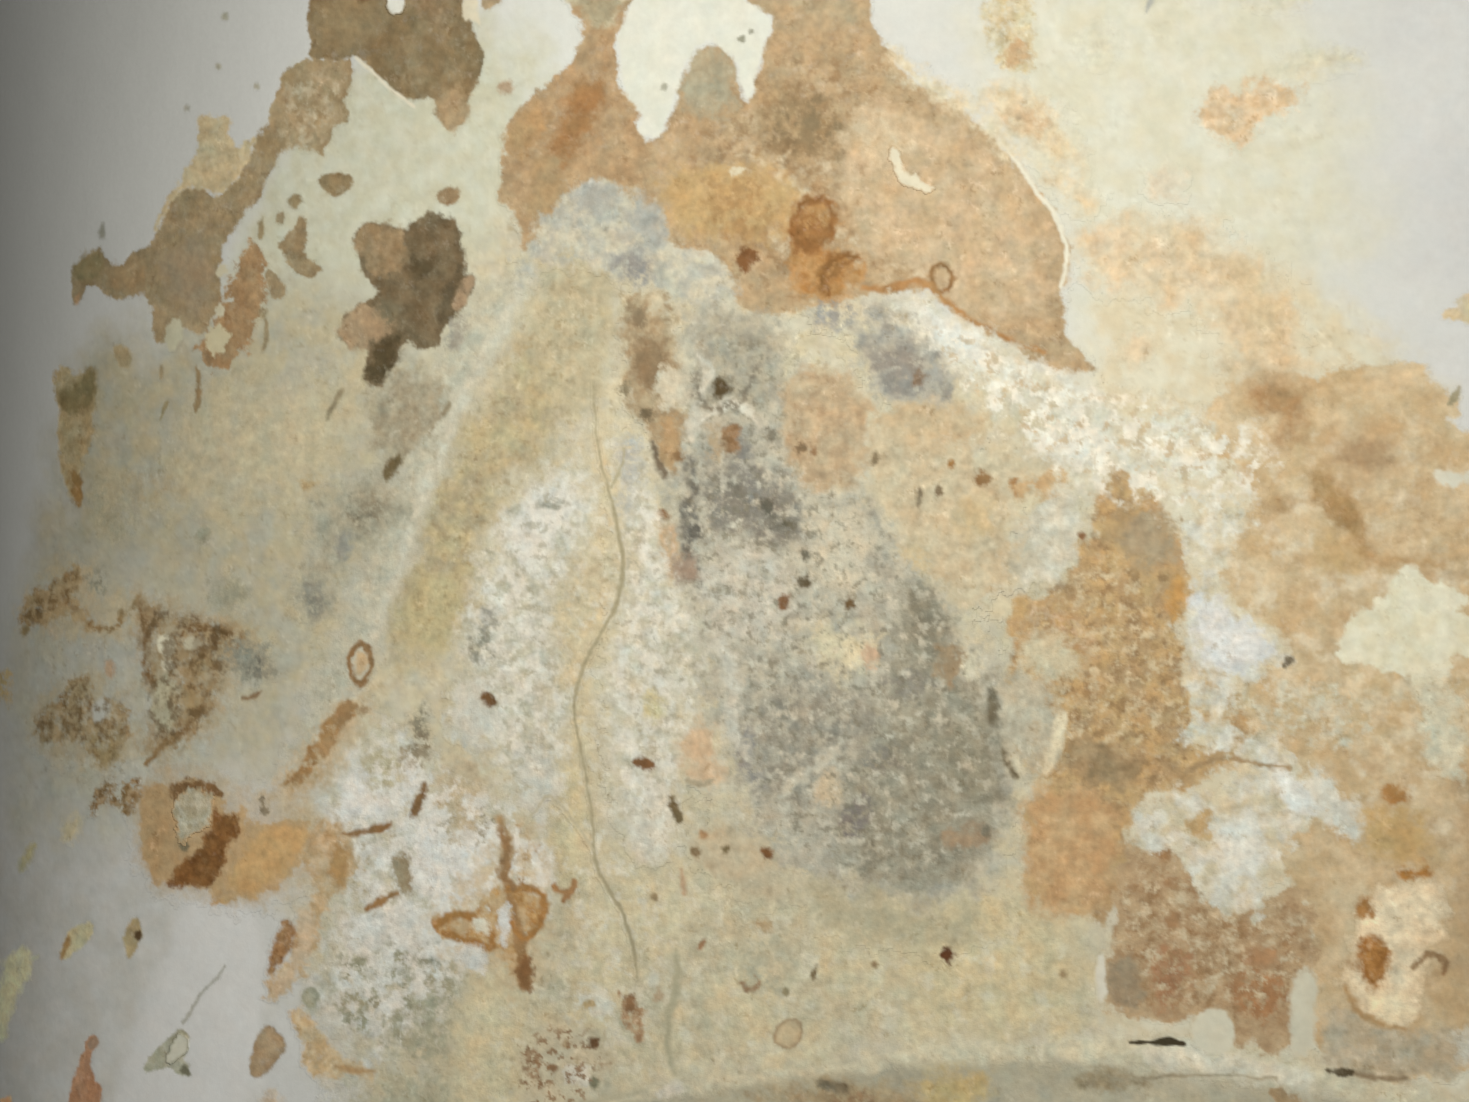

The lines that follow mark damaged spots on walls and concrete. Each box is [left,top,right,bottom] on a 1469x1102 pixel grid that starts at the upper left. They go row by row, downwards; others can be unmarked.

peeling [69,0,503,414]
peeling [495,0,1098,372]
water stain [972,75,1319,379]
peeling [1439,290,1469,326]
corrosion [0,544,437,1084]
corrosion [419,810,667,1102]
crack [521,379,685,1077]
water stain [83,174,1469,1102]
peeling [997,353,1469,1092]
peeling [1266,1083,1310,1102]